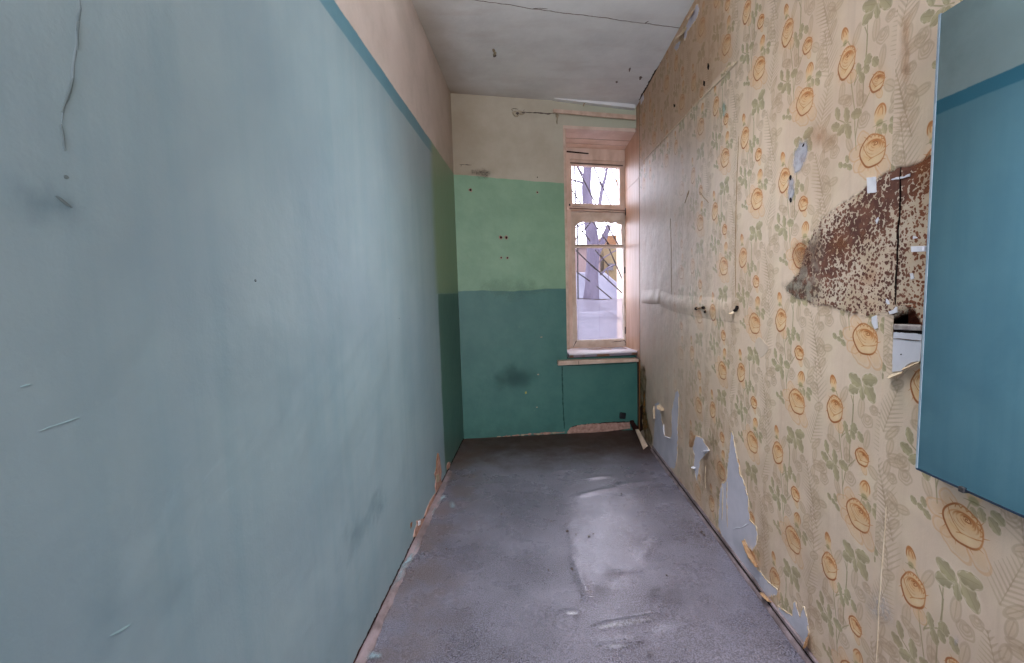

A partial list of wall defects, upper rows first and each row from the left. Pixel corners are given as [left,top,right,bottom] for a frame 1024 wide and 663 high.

crack [60,0,82,151]
spalling [497,421,631,437]
peeling [410,453,450,537]